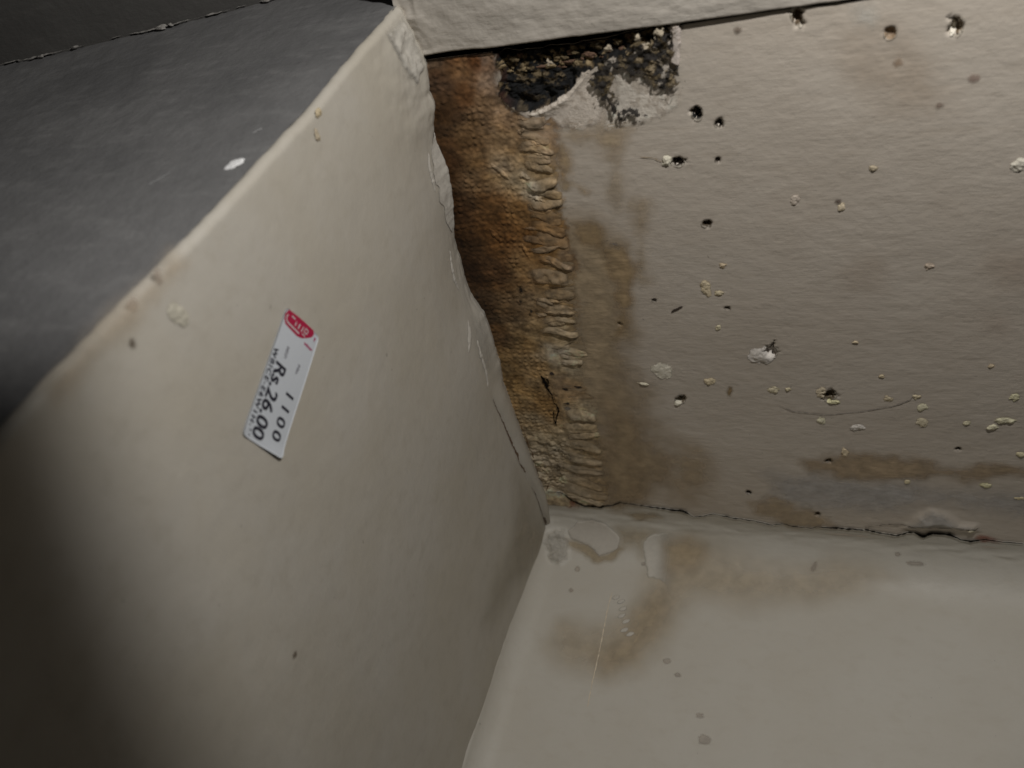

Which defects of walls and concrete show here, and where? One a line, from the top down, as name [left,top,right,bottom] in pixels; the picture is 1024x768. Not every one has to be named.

spalling [948,16,964,37]
peeling [427,23,681,556]
damp [562,223,668,520]
peeling [748,343,779,364]
crack [541,376,560,425]
crack [494,402,1023,544]
damp [806,455,1024,480]